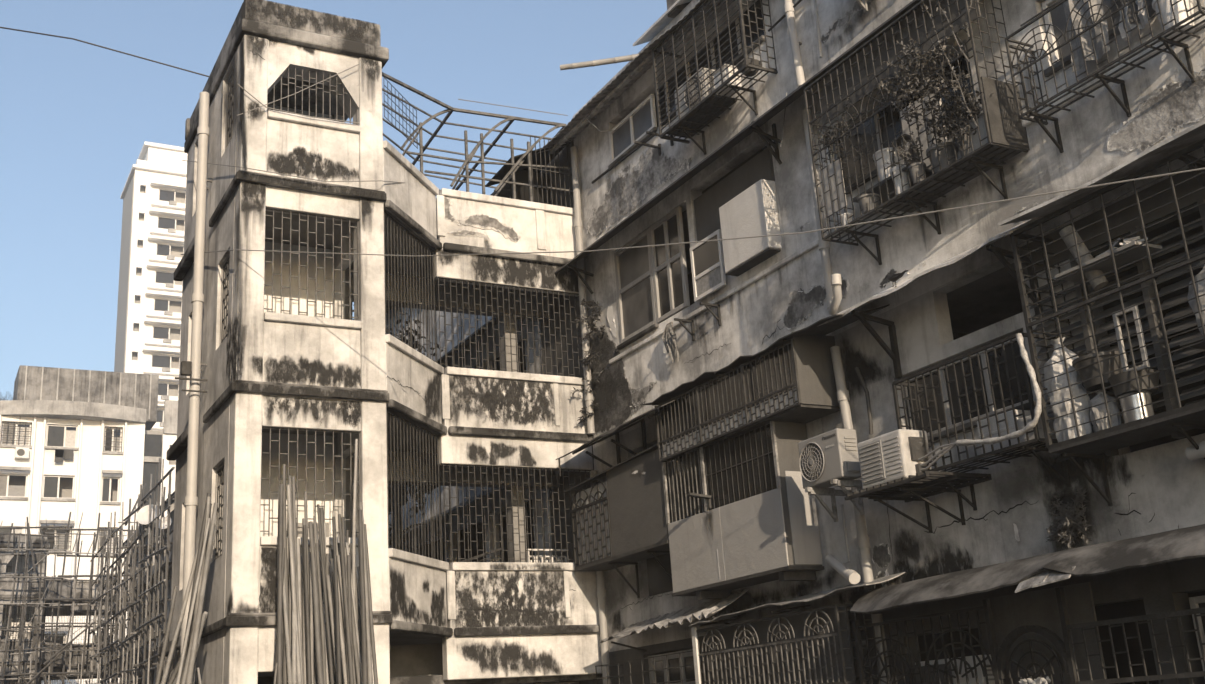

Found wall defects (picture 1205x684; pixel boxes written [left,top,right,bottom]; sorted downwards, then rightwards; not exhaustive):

peeling [1105,67,1205,153]
water stain [221,34,387,425]
peeling [584,145,691,239]
peeling [783,281,826,330]
peeling [841,277,850,299]
water stain [425,373,589,466]
water stain [592,379,616,420]
crack [925,500,1038,534]
mould [373,563,593,674]